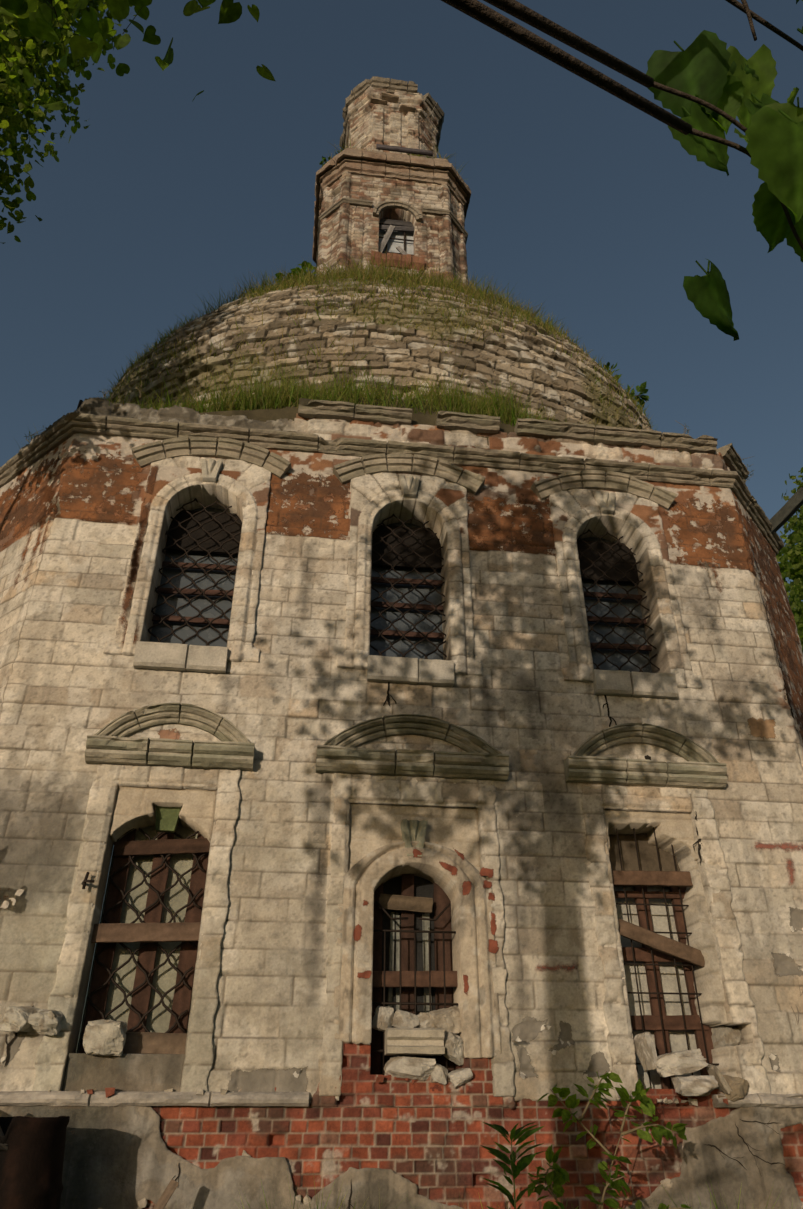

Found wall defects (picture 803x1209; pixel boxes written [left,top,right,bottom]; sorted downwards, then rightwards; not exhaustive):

spalling [747,717,776,739]
peeling [511,1017,575,1079]
peeling [769,1053,780,1072]
spalling [151,1042,736,1209]
crack [704,1119,786,1177]
spalling [780,1119,803,1209]
spalling [138,1198,156,1209]